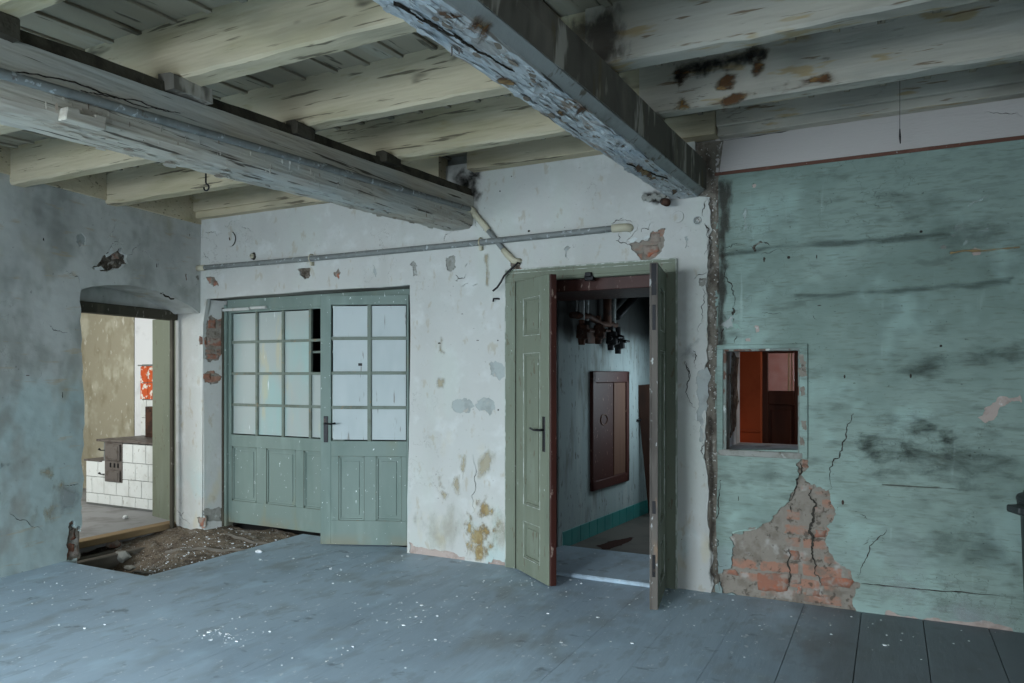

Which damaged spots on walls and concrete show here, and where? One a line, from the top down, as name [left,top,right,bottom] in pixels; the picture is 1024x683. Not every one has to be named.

leakage [716,70,747,106]
leakage [751,58,764,76]
leakage [795,74,831,89]
spalling [93,249,126,271]
spalling [627,228,665,260]
crack [685,203,737,403]
spalling [199,315,221,385]
leakage [480,453,491,474]
crack [829,415,852,489]
spalling [66,507,297,576]
spalling [718,459,860,611]
crack [858,515,1000,596]